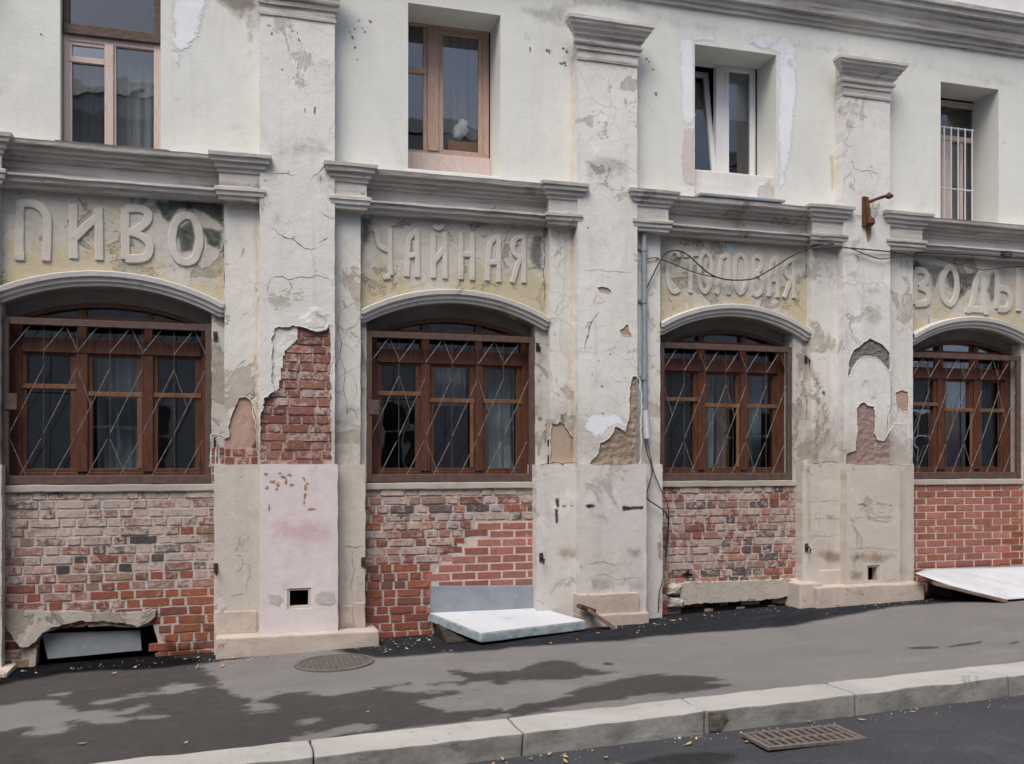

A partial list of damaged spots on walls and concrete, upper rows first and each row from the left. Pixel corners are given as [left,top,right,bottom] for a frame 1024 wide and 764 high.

flaking render [847,336,892,377]
flaking render [209,323,334,510]
flaking render [538,413,574,465]
flaking render [589,369,643,464]
flaking render [845,389,910,466]